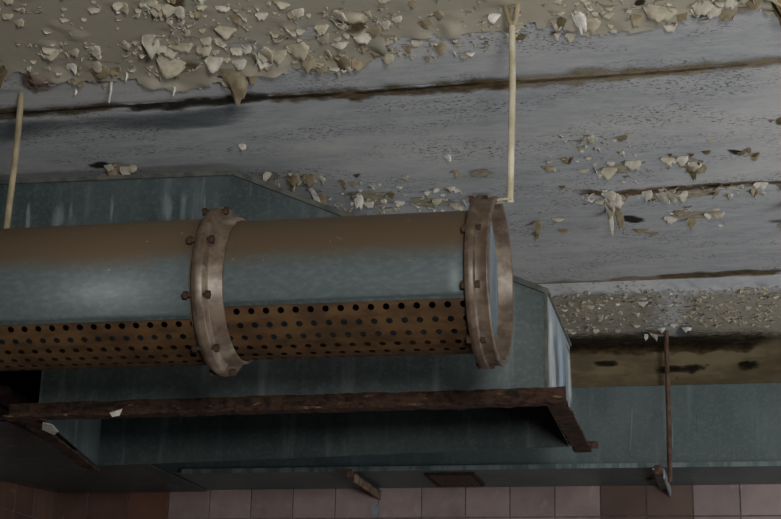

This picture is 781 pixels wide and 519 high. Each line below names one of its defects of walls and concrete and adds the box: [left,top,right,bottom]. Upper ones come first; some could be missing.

peeling [0,0,42,28]
peeling [543,0,781,42]
peeling [16,0,534,106]
peeling [263,155,493,214]
peeling [542,134,781,237]
peeling [551,285,781,341]
water stain [549,318,771,400]